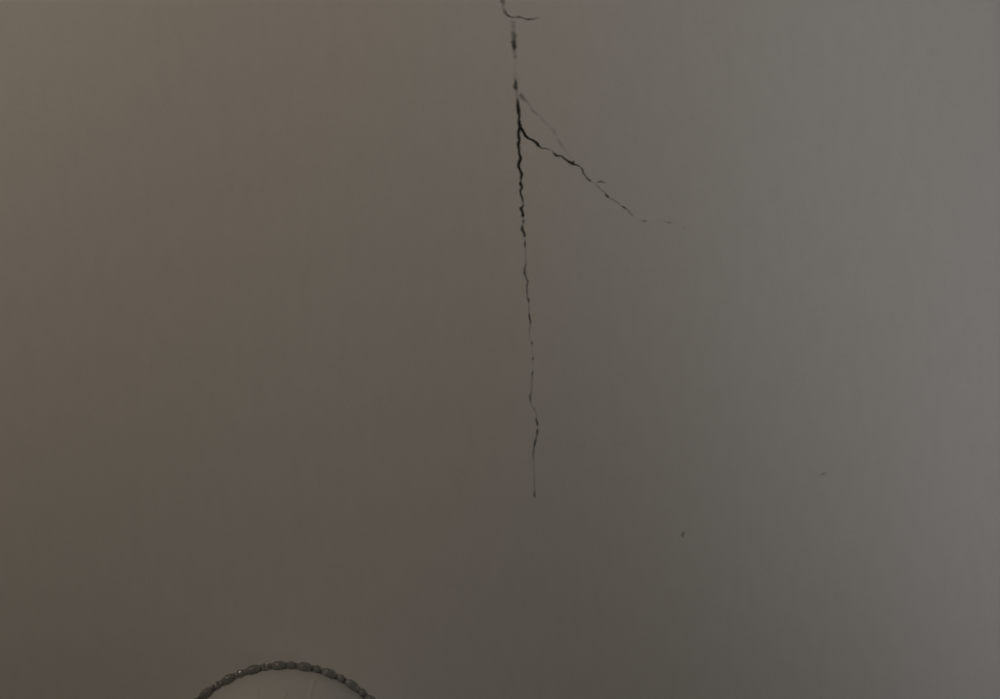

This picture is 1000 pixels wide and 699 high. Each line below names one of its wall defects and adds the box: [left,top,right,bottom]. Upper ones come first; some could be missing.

crack [514,81,625,237]